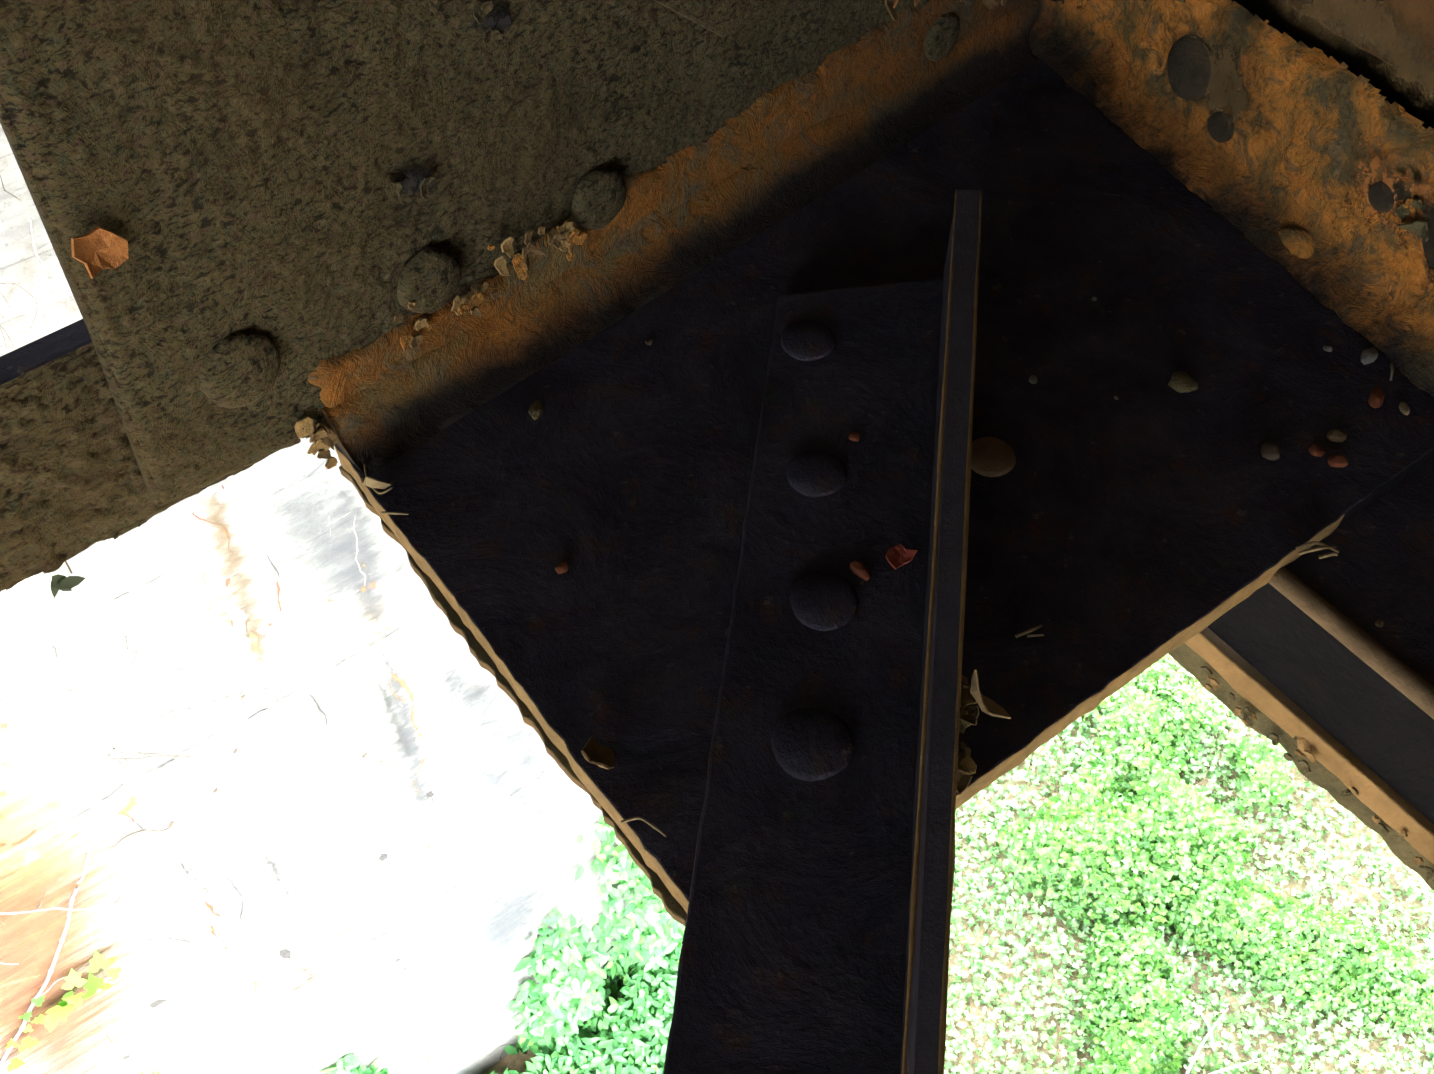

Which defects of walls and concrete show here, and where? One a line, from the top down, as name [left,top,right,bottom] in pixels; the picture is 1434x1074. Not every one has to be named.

peeling [1161,14,1267,140]
peeling [1279,0,1434,103]
corrosion [394,301,432,360]
corrosion [451,221,588,318]
peeling [1342,122,1434,283]
corrosion [1394,199,1429,242]
crack [49,490,433,839]
water stain [380,662,422,797]
corrosion [0,816,118,1074]
crack [186,865,245,950]